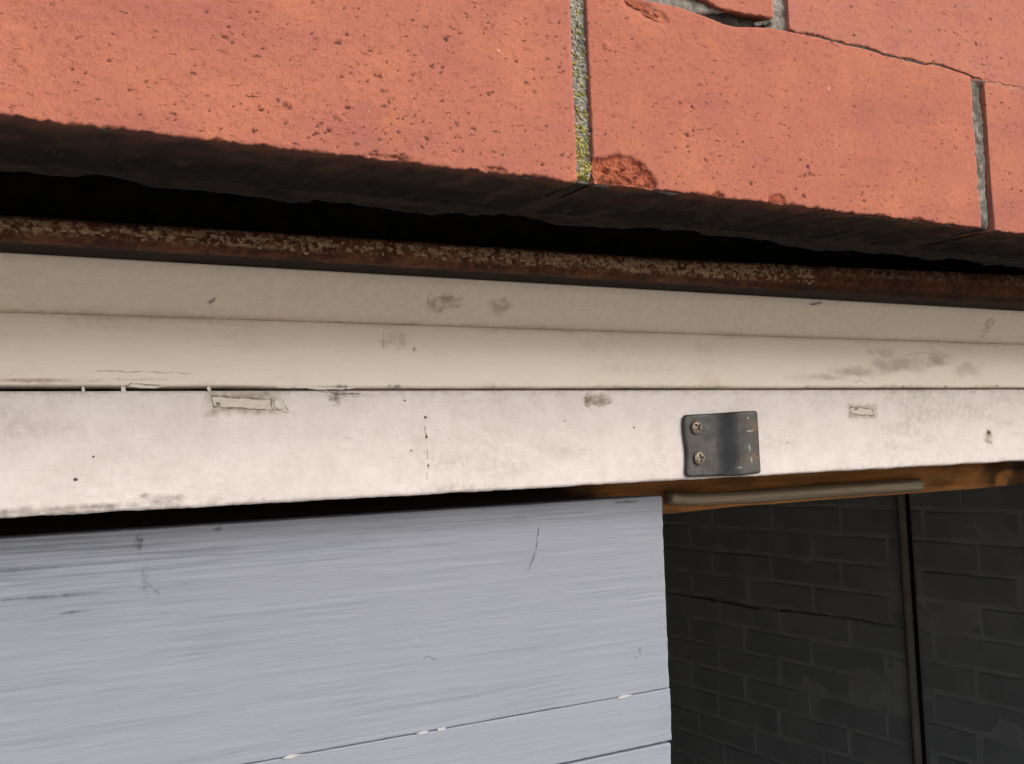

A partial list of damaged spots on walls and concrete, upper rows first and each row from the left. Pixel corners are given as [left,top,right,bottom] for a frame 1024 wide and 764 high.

crack [793,31,991,82]
spalling [591,155,656,189]
peeling [207,384,355,413]
crack [670,593,902,627]